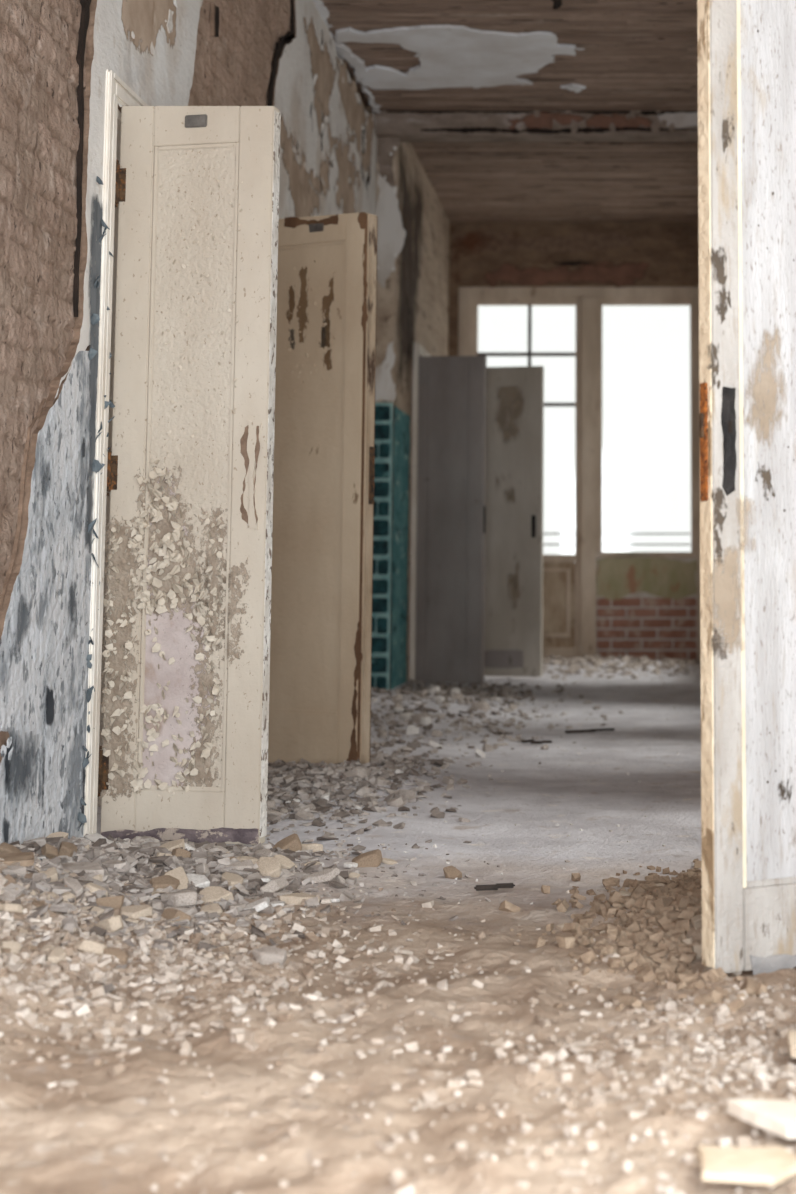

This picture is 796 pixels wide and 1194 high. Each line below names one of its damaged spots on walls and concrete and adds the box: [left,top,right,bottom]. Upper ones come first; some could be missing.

damp [399,158,423,377]
flaking render [0,0,249,803]
flaking render [188,0,586,838]
peeling [743,330,783,445]
peeling [756,464,775,501]
peeling [78,797,87,831]
peeling [766,770,791,801]